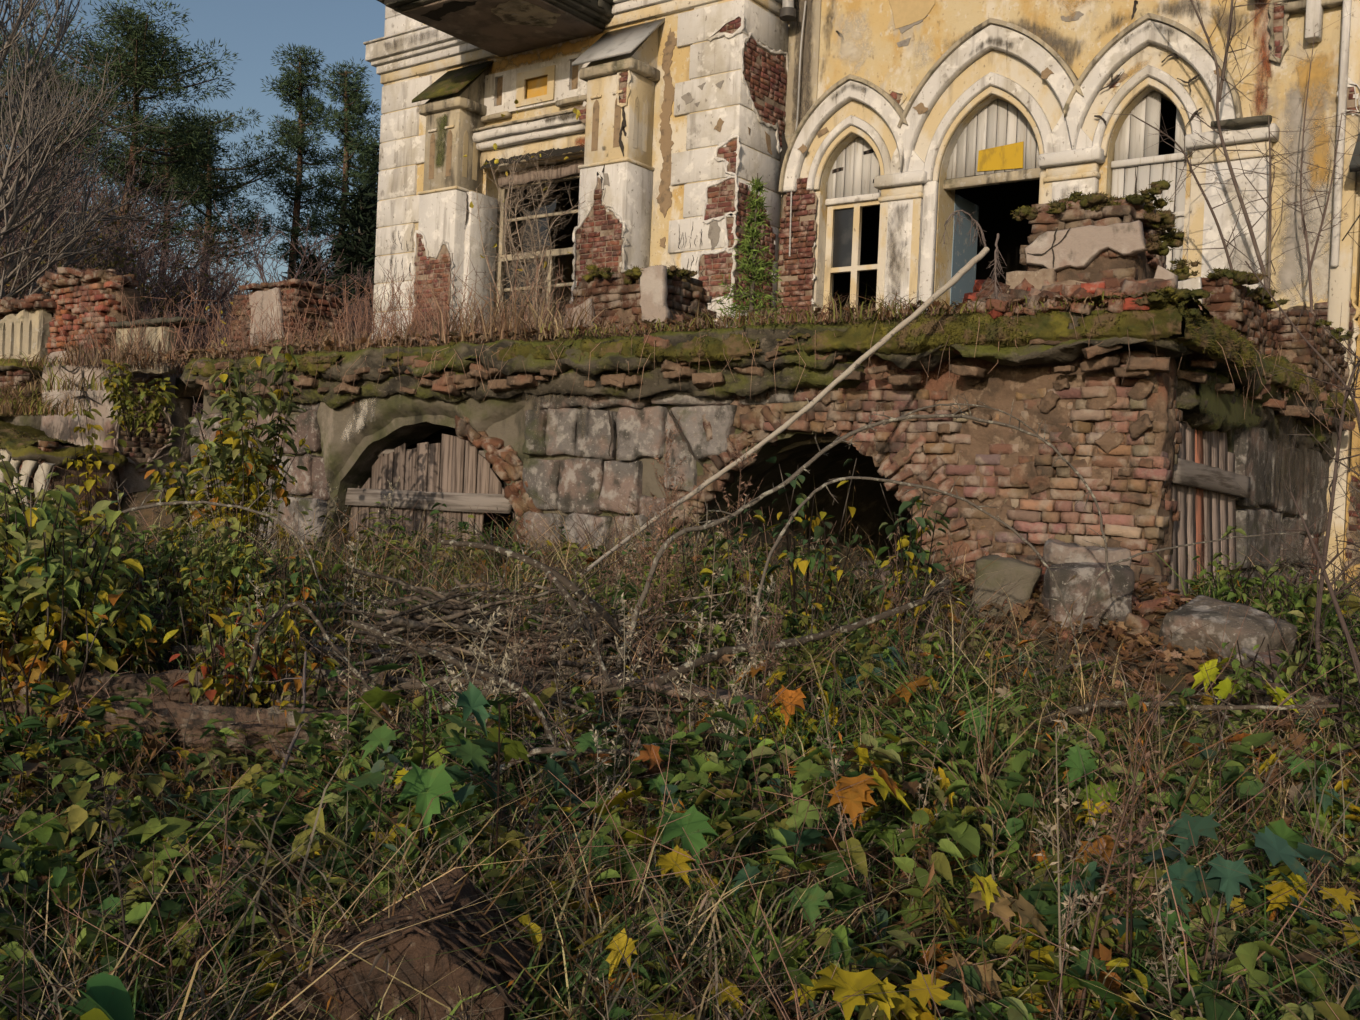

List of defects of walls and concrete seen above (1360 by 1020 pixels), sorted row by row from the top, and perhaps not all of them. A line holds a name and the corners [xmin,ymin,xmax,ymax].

flaking render [410,230,454,340]
flaking render [571,171,627,302]
flaking render [656,28,724,218]
flaking render [695,11,818,324]
corrosion [1255,0,1272,113]
flaking render [762,352,1183,591]